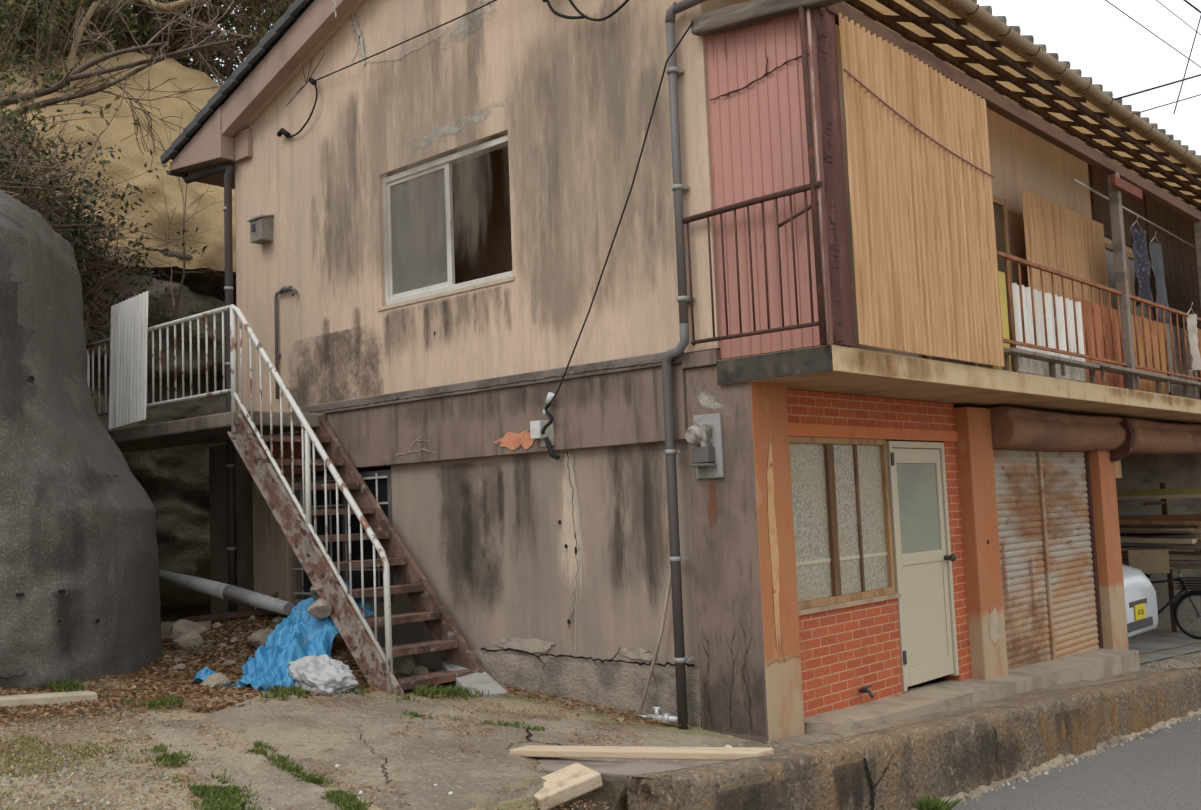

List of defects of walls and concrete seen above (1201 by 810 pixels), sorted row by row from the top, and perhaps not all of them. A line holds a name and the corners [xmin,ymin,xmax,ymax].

crack [710,50,809,100]
leakage [291,330,375,407]
spalling [494,429,535,450]
leakage [444,465,503,596]
crack [481,452,801,728]
crack [507,729,597,748]